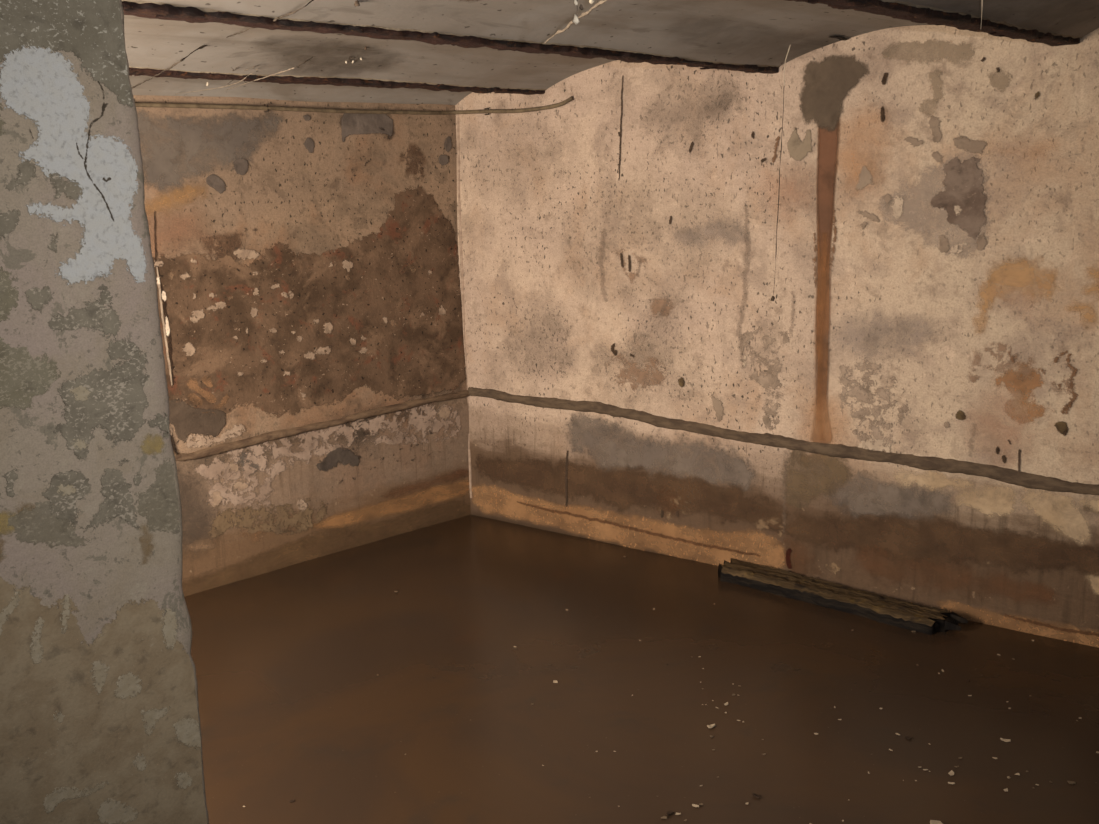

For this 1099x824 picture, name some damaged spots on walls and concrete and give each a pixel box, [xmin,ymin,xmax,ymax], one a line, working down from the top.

peeling [5,159,84,200]
crack [76,81,114,221]
corrosion [800,55,869,443]
spalling [856,70,990,258]
corrosion [969,343,1079,440]
damp [178,413,1099,648]